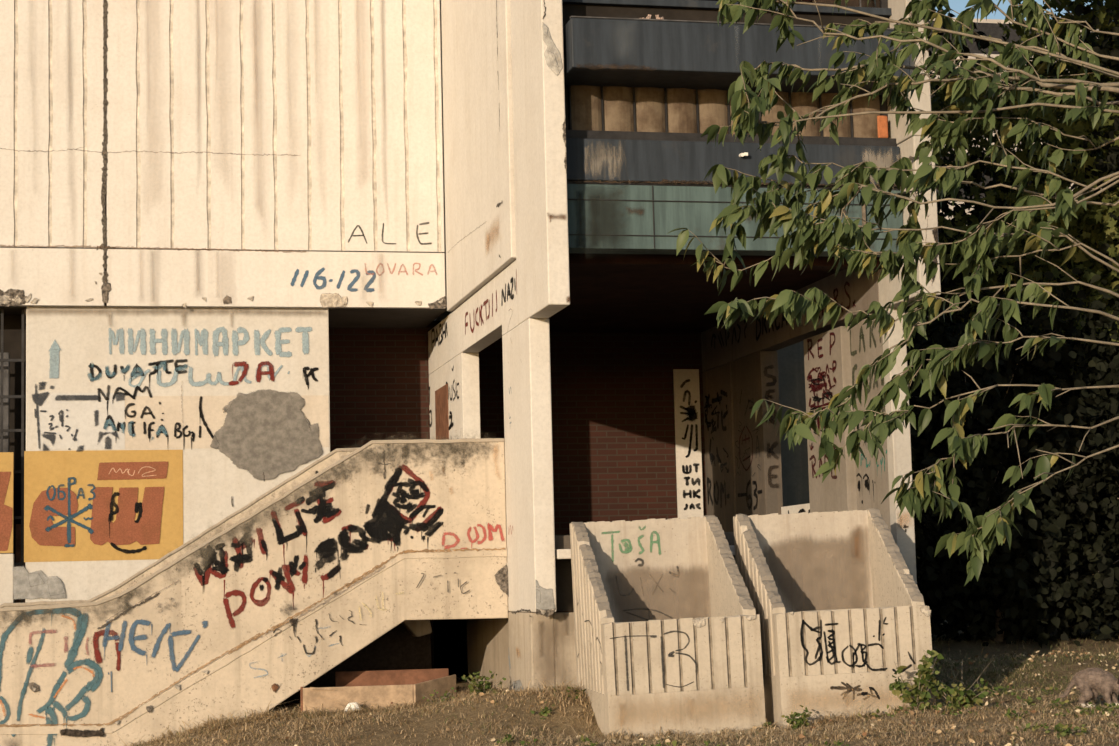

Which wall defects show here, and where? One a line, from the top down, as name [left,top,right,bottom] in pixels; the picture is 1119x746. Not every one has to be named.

crack [97,0,116,299]
peeling [584,143,622,179]
peeling [863,150,900,182]
spalling [0,289,39,307]
peeling [210,389,323,480]